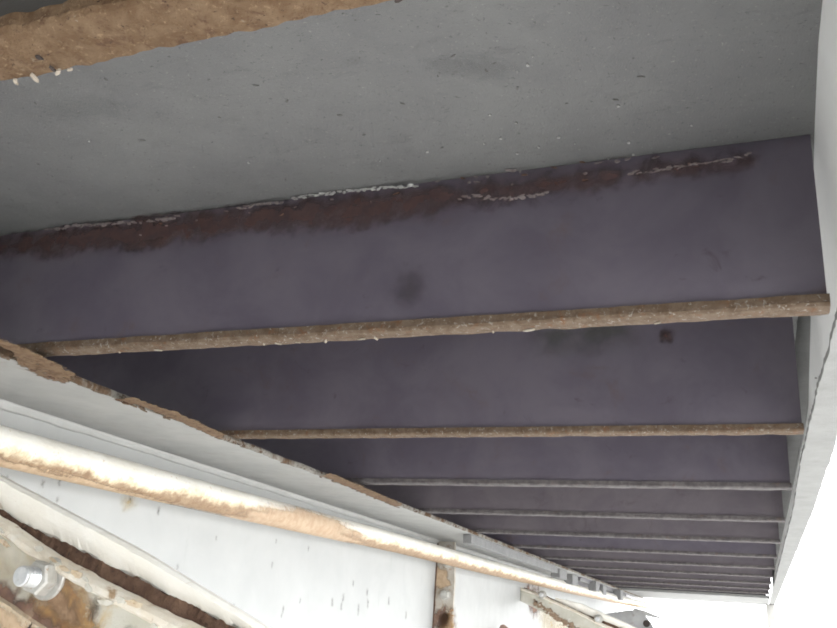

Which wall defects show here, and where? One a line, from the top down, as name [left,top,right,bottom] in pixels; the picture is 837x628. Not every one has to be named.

corrosion [0,152,754,259]
corrosion [0,339,76,384]
corrosion [115,397,226,440]
corrosion [319,473,402,508]
corrosion [217,507,364,543]
corrosion [0,509,236,628]
corrosion [432,562,455,628]